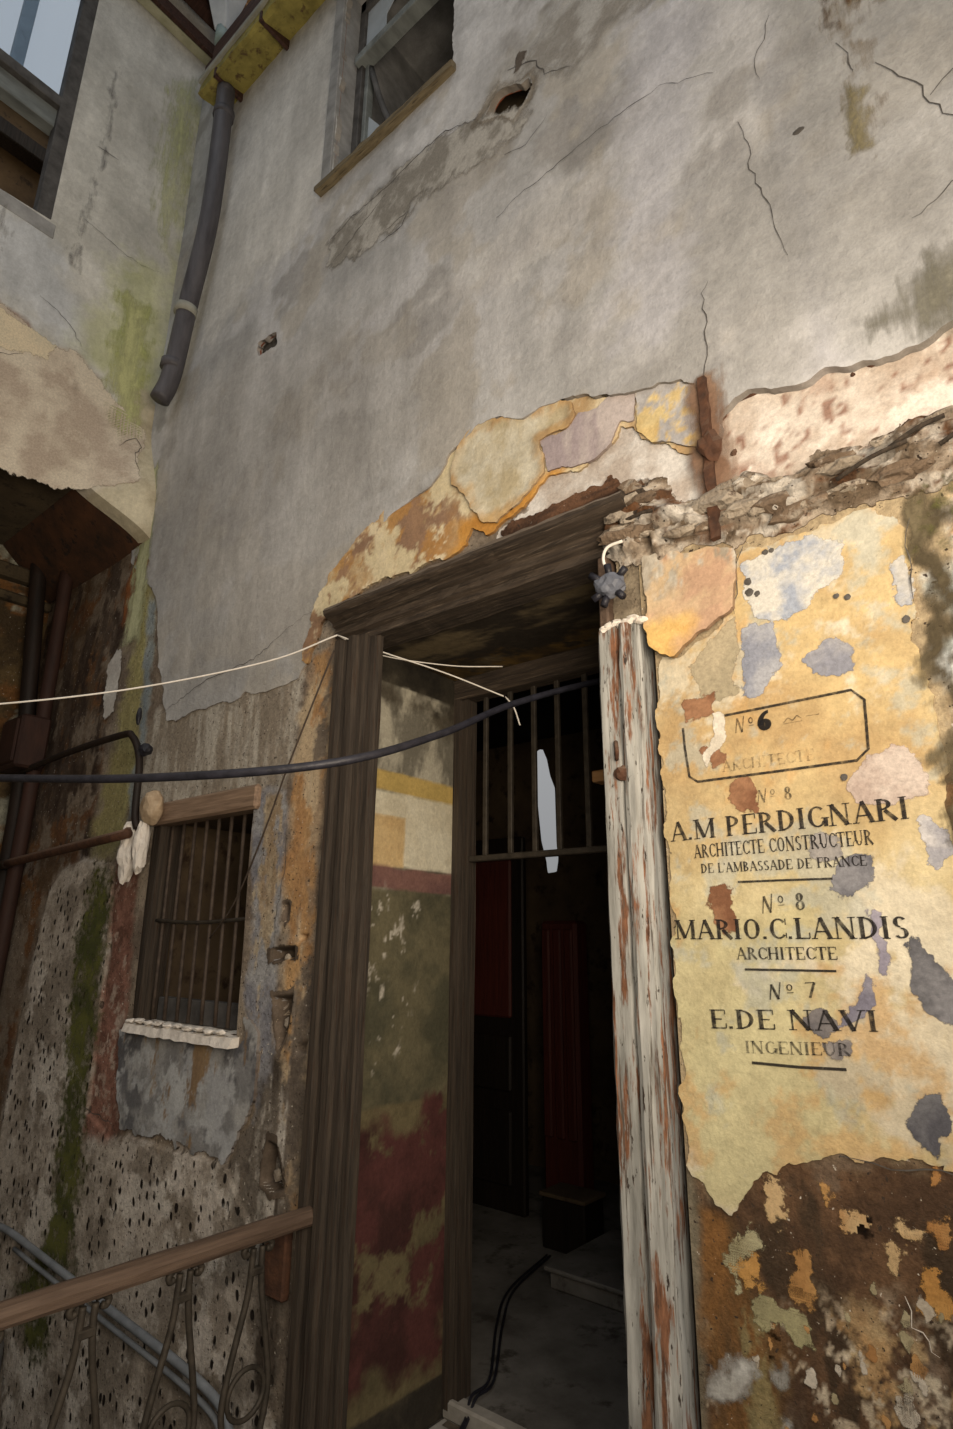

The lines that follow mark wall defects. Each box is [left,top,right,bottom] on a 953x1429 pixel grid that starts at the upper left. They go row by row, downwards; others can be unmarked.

spalling [326,0,652,268]
crack [738,122,788,255]
crack [836,43,953,115]
peeling [0,303,146,490]
damp [106,291,151,436]
peeling [302,382,703,665]
rust [686,372,734,542]
peeling [116,985,295,1165]
peeling [722,1174,839,1405]
peeling [835,1344,878,1377]
peeling [881,1267,953,1429]
peeling [883,1216,952,1277]